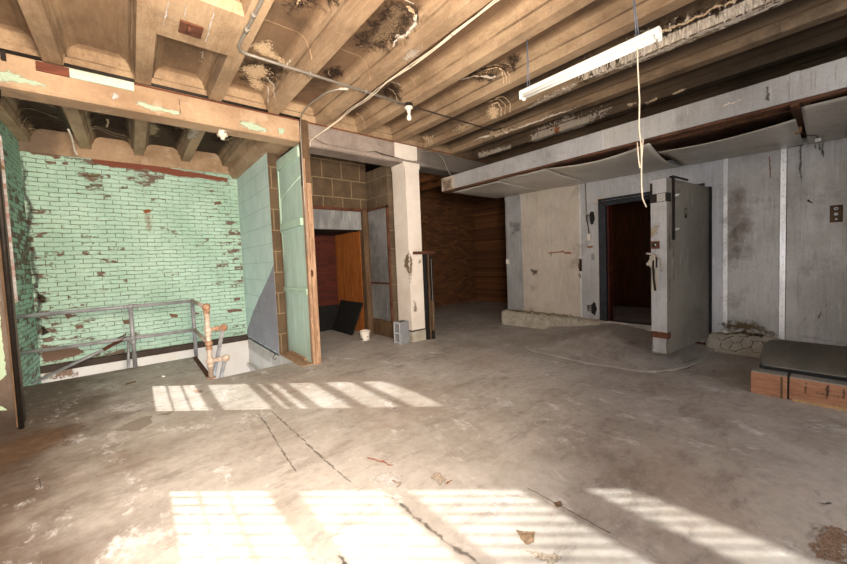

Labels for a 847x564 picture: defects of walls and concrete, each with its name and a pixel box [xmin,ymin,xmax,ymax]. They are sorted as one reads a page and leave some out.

water stain [354,0,419,53]
water stain [238,40,291,104]
water stain [462,55,519,84]
water stain [473,0,786,141]
peeling [30,152,68,165]
peeling [91,159,228,182]
peeling [40,344,85,380]
spalling [803,525,847,564]